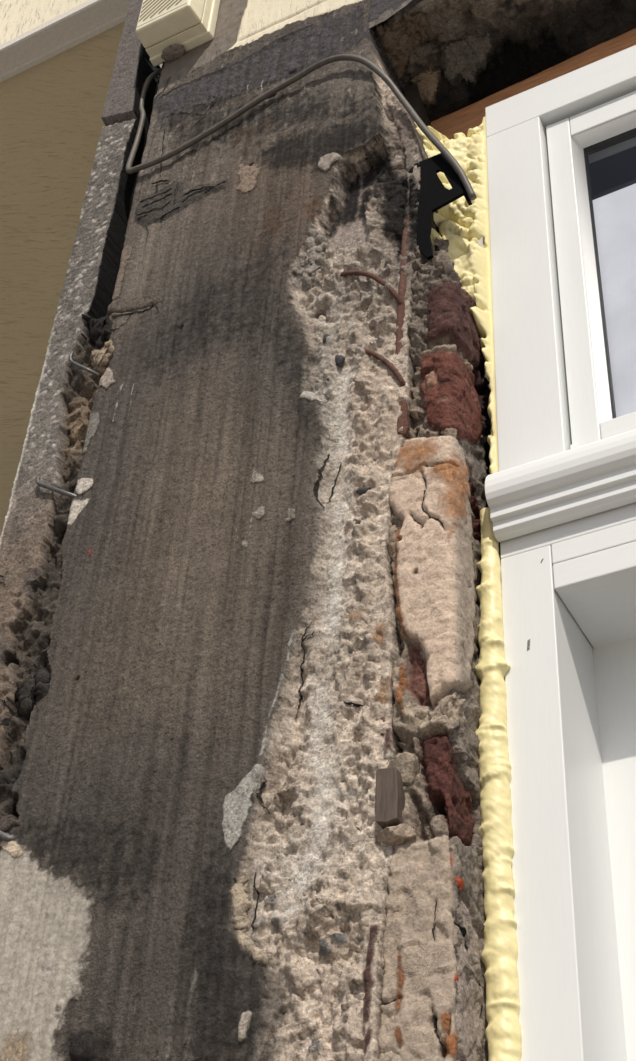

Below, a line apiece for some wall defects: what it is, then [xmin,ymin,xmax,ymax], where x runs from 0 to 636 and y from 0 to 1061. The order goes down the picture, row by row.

spalling [410,32,492,104]
peeling [83,412,100,455]
peeling [67,478,93,525]
crack [313,454,341,509]
crack [396,465,445,529]
corrosion [396,440,469,536]
spalling [222,51,428,1061]
crack [296,622,314,720]
flaking render [0,840,92,1061]